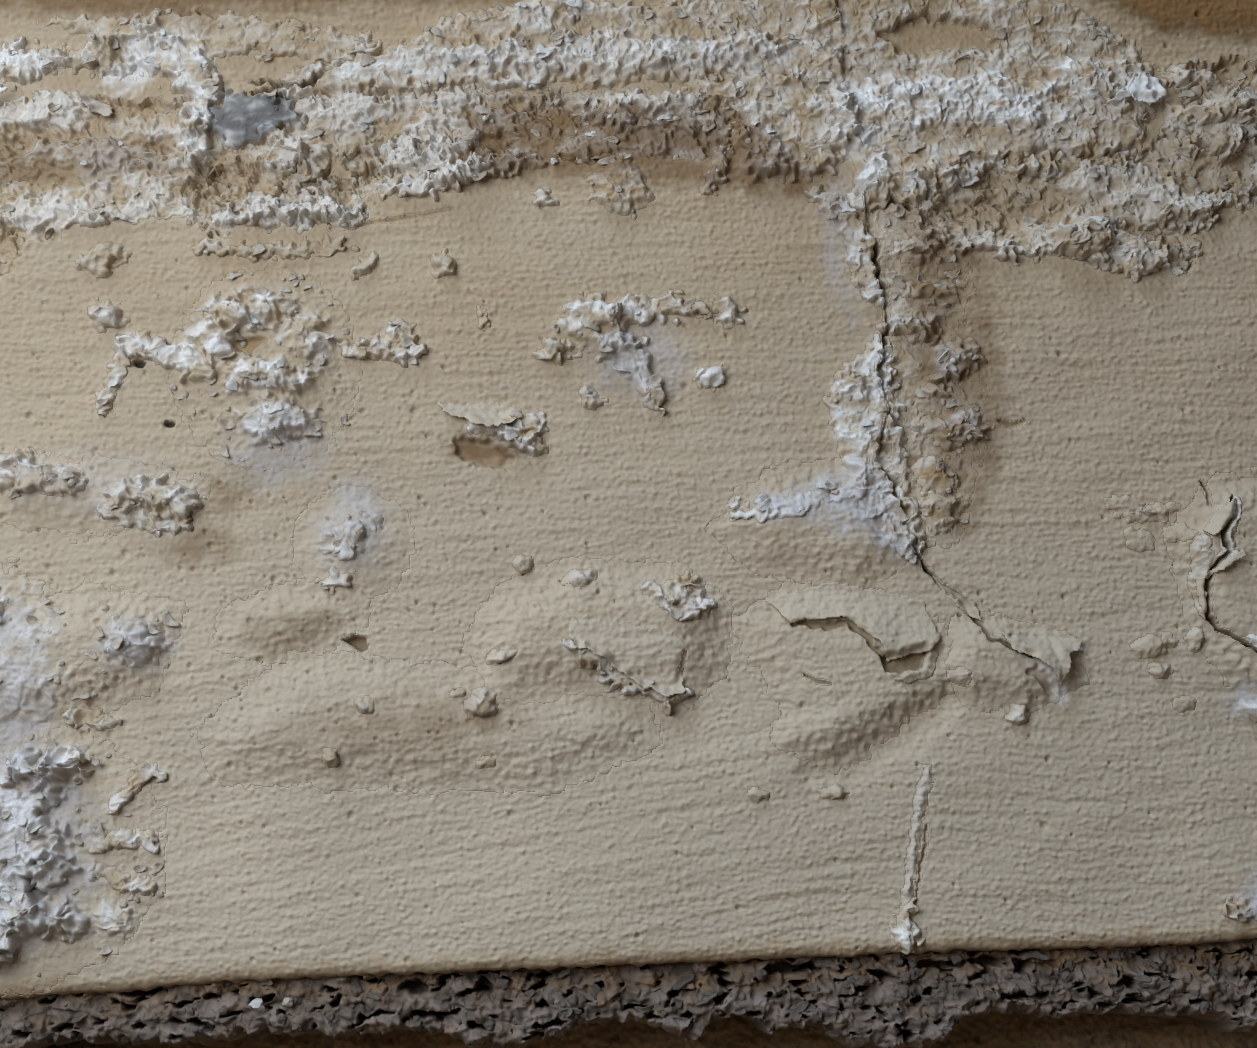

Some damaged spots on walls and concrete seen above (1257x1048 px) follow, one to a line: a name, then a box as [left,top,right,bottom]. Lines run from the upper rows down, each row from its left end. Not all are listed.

spalling [0,83,732,278]
spalling [865,54,1257,552]
peeling [438,401,523,427]
crack [862,190,1035,659]
crack [1187,479,1257,653]
peeling [569,614,686,697]
crack [802,673,832,686]
efflorescence [0,556,189,998]
efflorescence [1222,885,1257,922]
spalling [0,938,1257,1048]